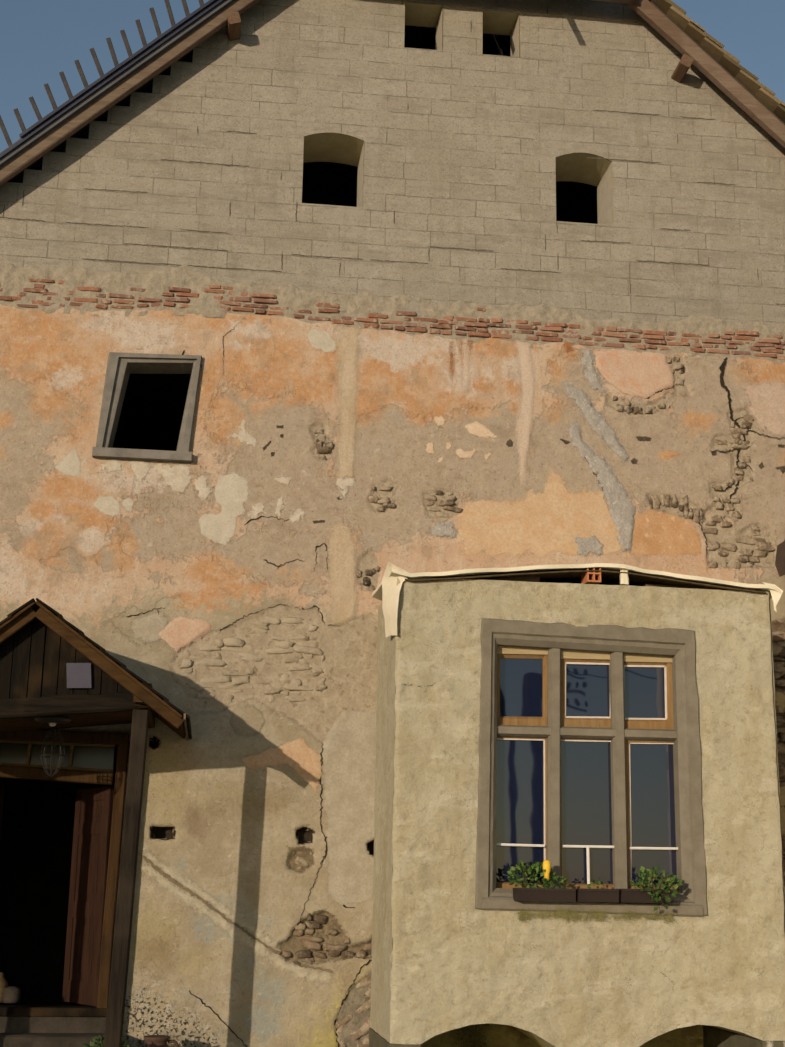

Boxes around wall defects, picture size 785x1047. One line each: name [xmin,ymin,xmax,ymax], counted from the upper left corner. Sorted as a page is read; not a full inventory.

spalling [311,425,334,461]
peeling [422,379,785,570]
peeling [594,349,690,415]
crack [711,357,784,499]
crack [176,604,340,657]
spalling [159,605,378,791]
spalling [772,619,785,787]
crack [287,744,328,940]
crack [189,990,247,1047]
spalling [277,910,372,1047]
leakage [437,1023,499,1047]